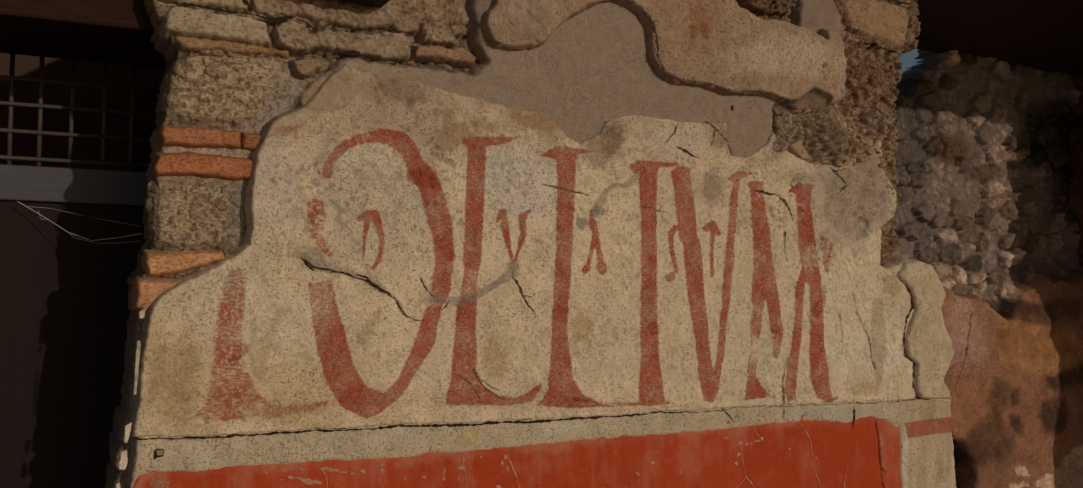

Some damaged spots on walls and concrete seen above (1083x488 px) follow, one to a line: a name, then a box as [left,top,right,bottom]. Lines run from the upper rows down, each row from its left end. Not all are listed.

spalling [773,88,834,115]
crack [302,258,449,321]
crack [131,277,930,488]